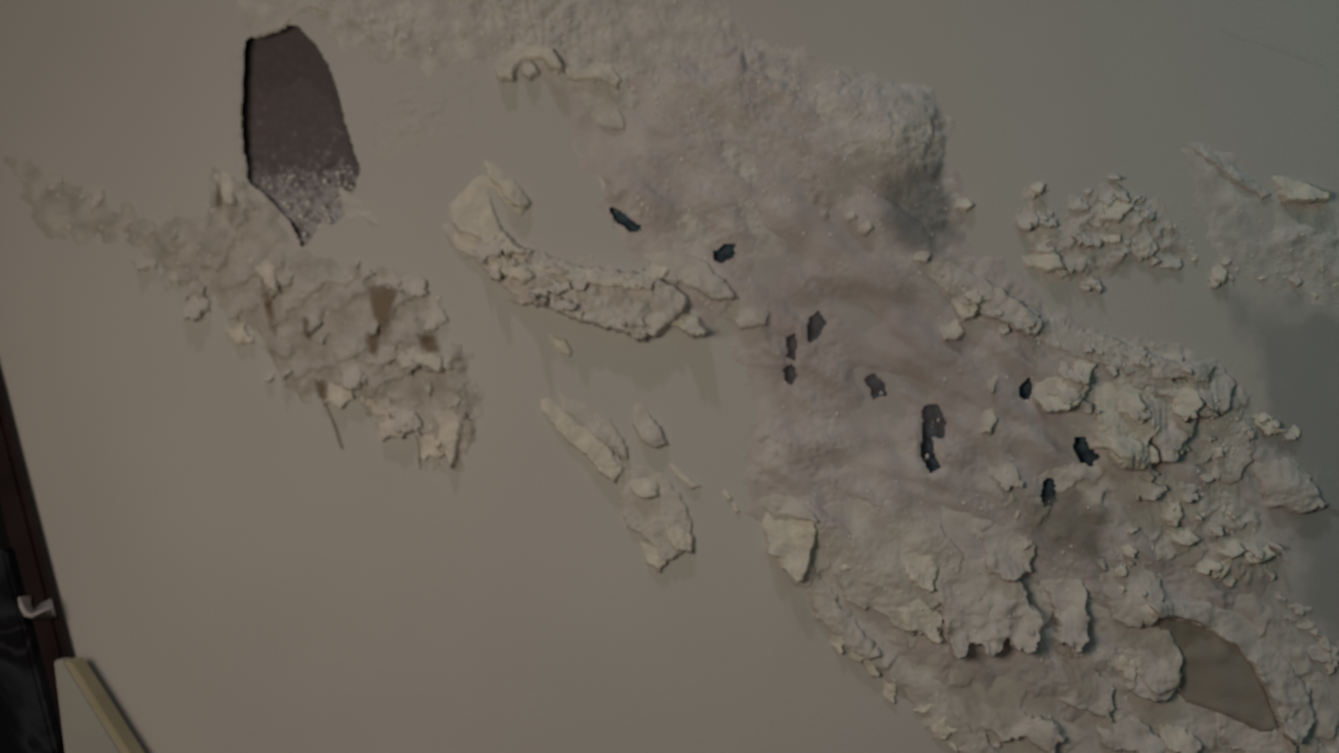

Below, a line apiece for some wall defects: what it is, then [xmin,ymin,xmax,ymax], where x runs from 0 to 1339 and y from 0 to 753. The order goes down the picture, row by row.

peeling [4,0,484,472]
peeling [442,161,771,342]
peeling [540,392,702,573]
peeling [756,174,1339,753]